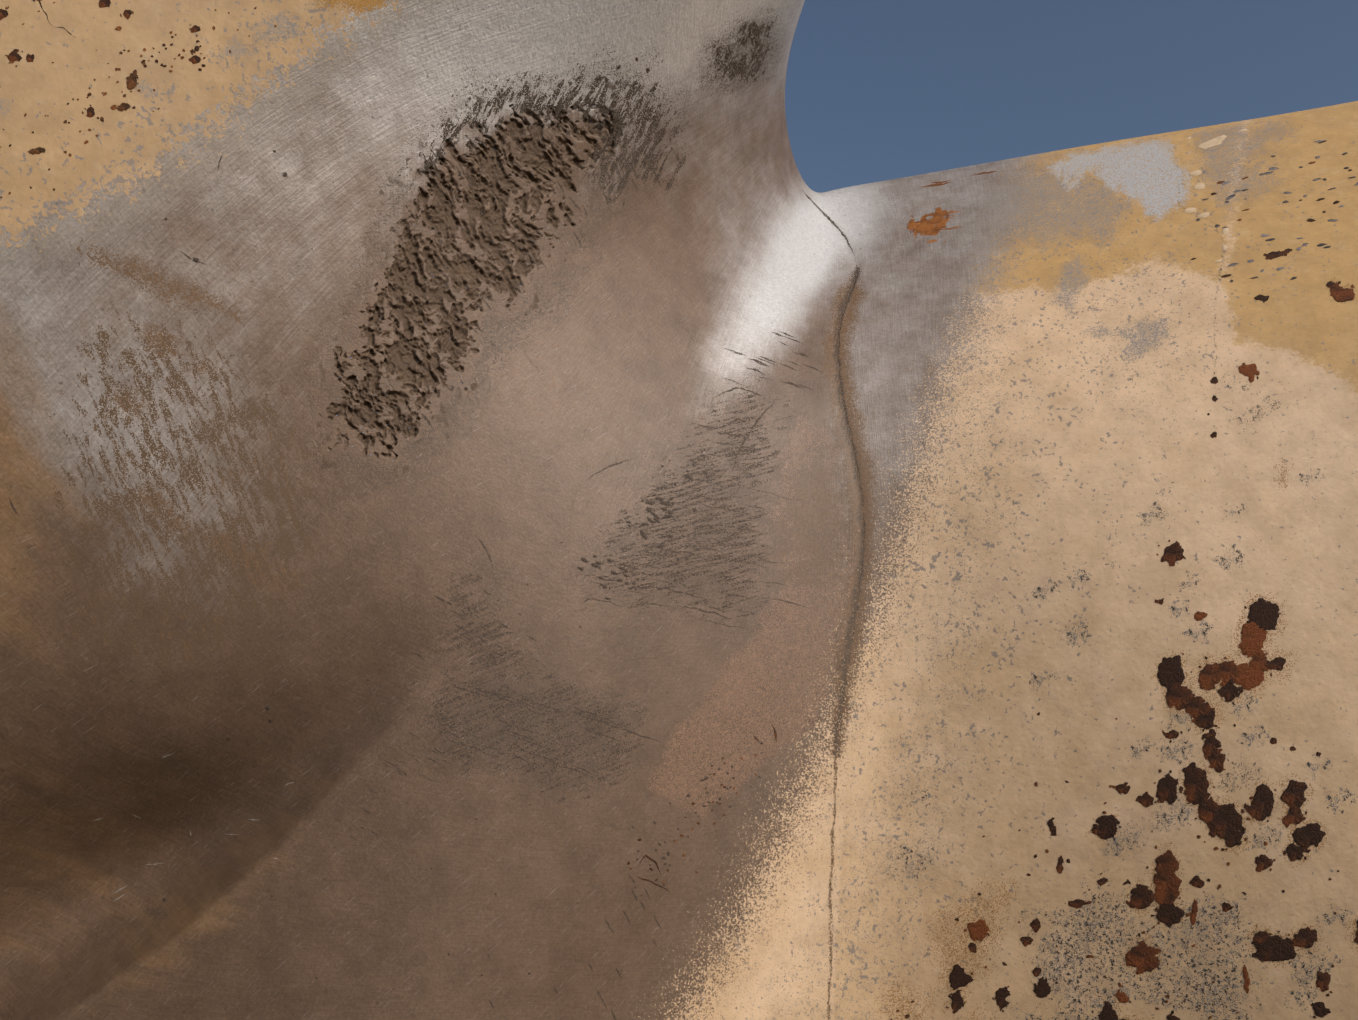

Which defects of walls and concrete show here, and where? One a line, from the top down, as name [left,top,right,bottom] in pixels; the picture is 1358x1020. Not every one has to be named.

spalling [294,7,787,505]
rust [1325,276,1358,303]
rust [1238,363,1260,383]
rust [1157,540,1186,566]
crack [802,190,879,1020]
rust [1112,592,1330,872]
rust [1085,811,1120,841]
rust [874,877,1041,1020]
rust [1032,967,1058,999]
rust [1119,842,1210,983]
rust [1242,922,1324,994]
rust [1311,971,1333,1018]